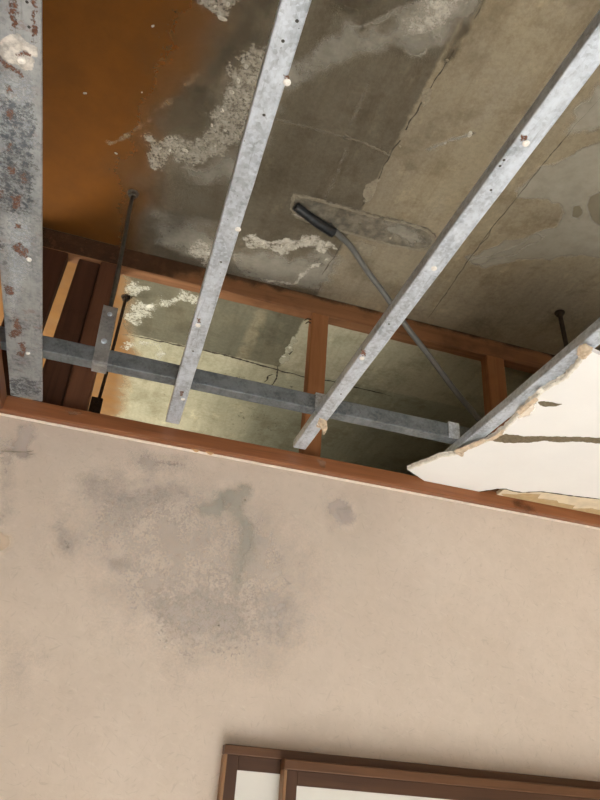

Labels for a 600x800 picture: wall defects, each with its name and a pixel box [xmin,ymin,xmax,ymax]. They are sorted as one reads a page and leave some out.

rust [0,0,218,249]
leakage [109,0,274,183]
rust [43,262,77,337]
rust [88,372,126,416]
rust [110,275,137,356]
leakage [42,213,213,278]
leakage [125,282,198,325]
crack [122,334,305,385]
spalling [279,336,298,364]
leakage [225,234,380,313]
spalling [407,356,584,470]
crack [428,98,600,318]